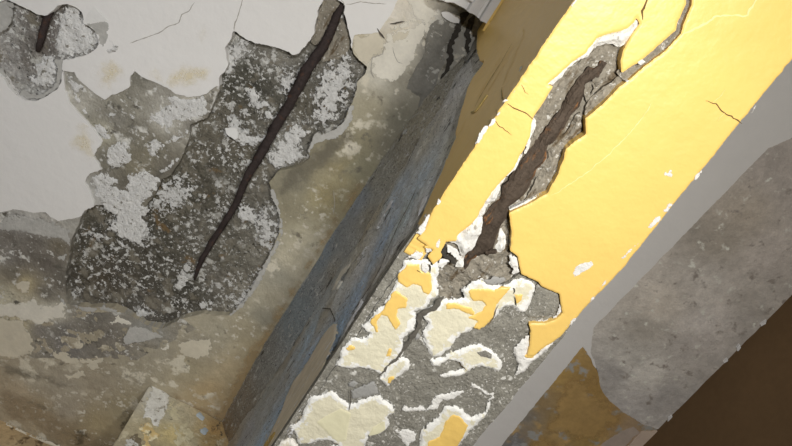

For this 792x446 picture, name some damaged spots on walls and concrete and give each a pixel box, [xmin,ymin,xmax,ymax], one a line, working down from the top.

crack [132,2,195,43]
crack [617,0,757,82]
crack [501,86,534,120]
crack [708,90,742,124]
peeling [0,0,467,446]
flaking render [222,13,638,446]
flaking render [502,138,792,446]